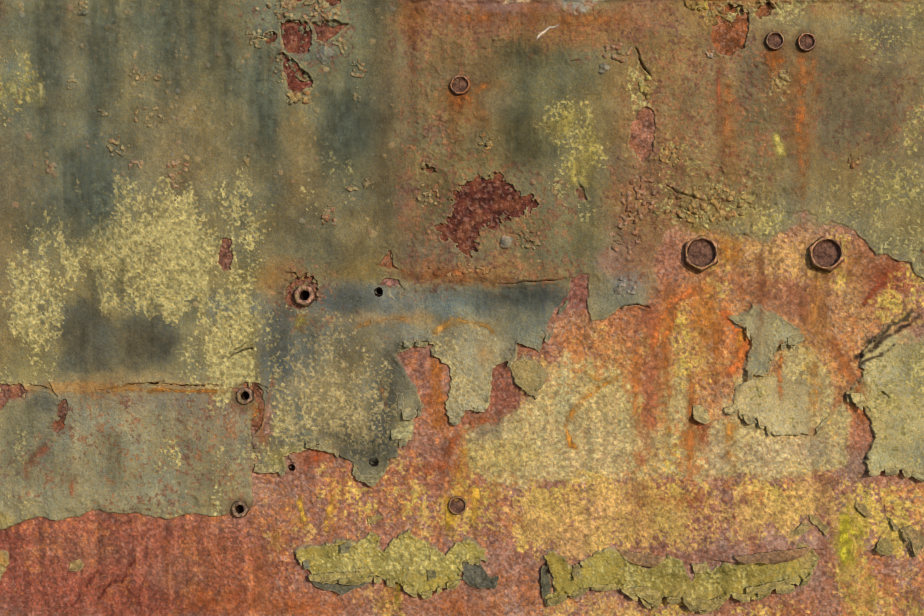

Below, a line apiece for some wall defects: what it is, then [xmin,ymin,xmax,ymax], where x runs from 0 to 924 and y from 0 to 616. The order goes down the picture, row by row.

corrosion [711,3,776,56]
peeling [252,295,570,487]
corrosion [566,409,576,449]
corrosion [633,289,749,426]
corrosion [686,375,705,468]
peeling [692,405,711,424]
peeling [722,303,831,437]
peeling [844,304,924,482]
peeling [0,549,10,581]
peeling [293,514,499,600]
peeling [540,514,830,614]
peeling [875,495,924,559]